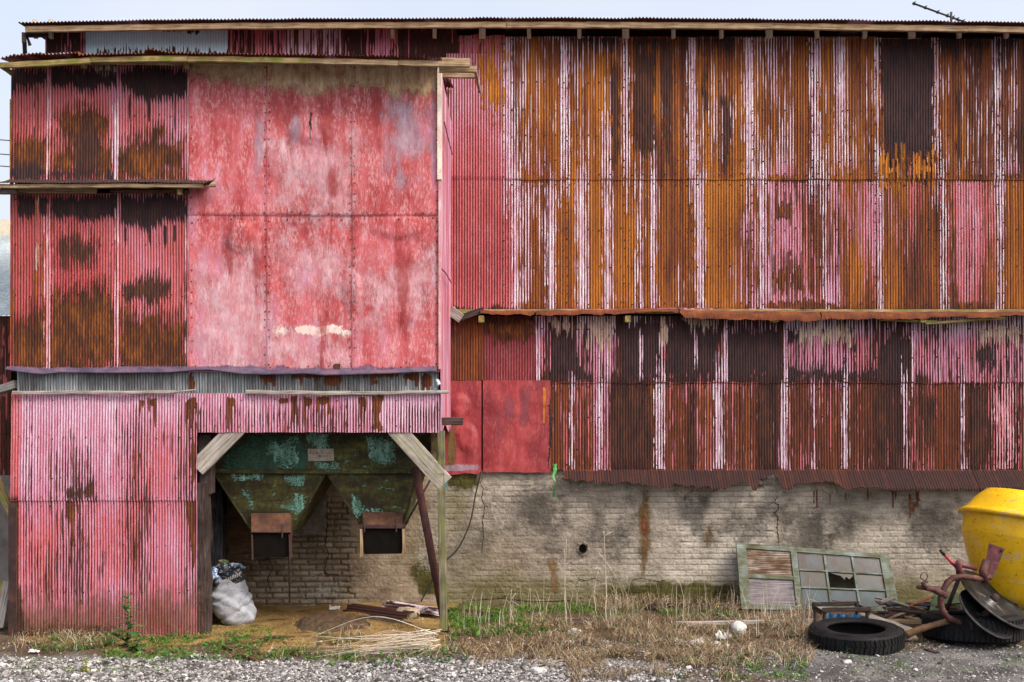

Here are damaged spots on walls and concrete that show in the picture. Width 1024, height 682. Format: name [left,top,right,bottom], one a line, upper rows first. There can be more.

leakage [191,64,437,100]
corrosion [570,38,620,166]
corrosion [875,37,1019,195]
corrosion [11,65,197,483]
peeling [272,323,353,339]
corrosion [259,364,342,428]
corrosion [358,372,432,431]
corrosion [610,317,909,470]
peeling [223,432,340,515]
peeling [350,493,383,518]
peeling [364,435,396,465]
crack [769,491,781,545]